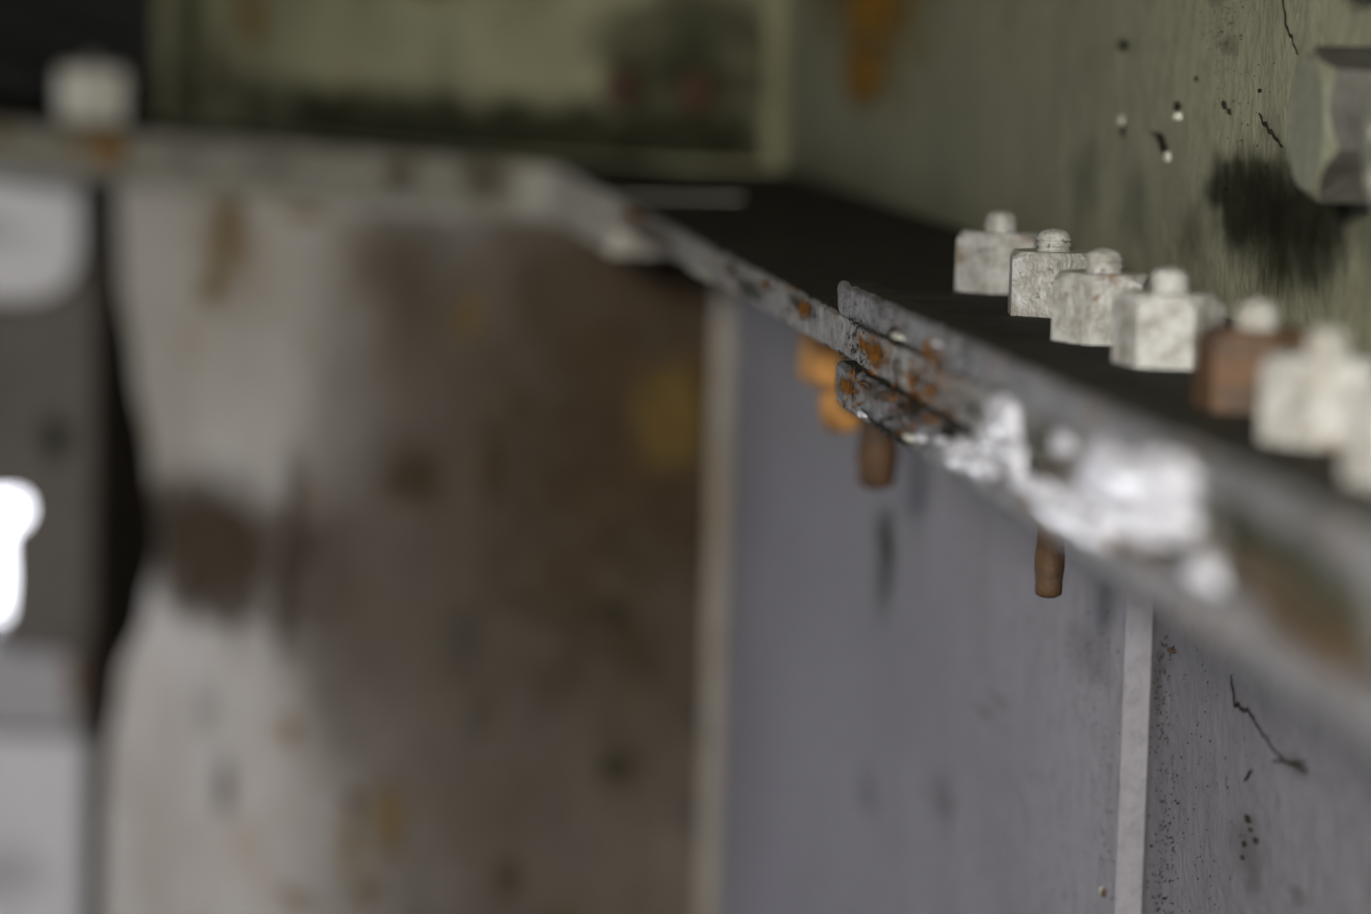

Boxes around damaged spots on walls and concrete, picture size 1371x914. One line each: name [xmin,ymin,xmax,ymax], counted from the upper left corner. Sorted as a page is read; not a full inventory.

crack [1282,0,1298,54]
corrosion [827,299,997,453]
crack [1230,675,1307,781]